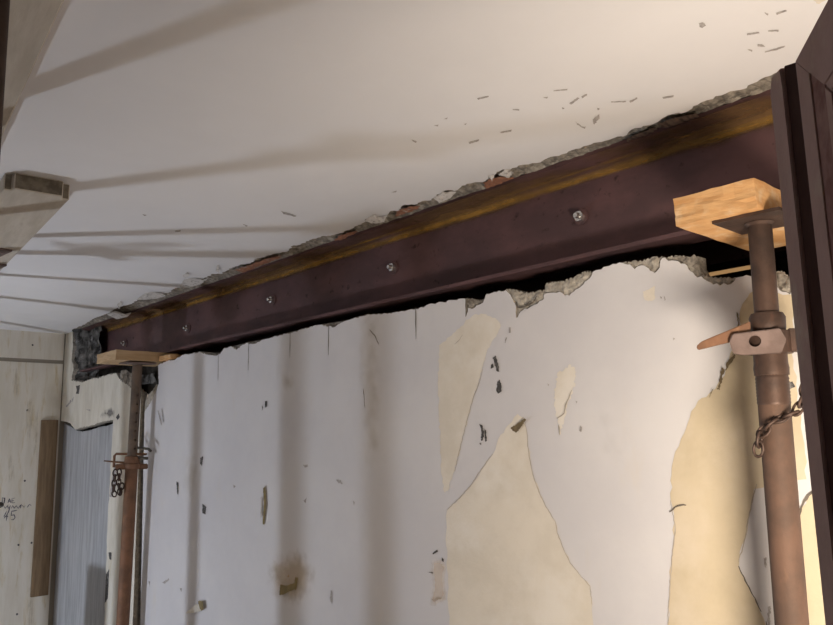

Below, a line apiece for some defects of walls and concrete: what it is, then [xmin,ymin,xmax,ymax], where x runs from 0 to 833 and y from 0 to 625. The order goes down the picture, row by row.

spalling [66,73,776,410]
peeling [776,271,794,330]
peeling [431,414,593,625]
peeling [668,351,771,625]
peeling [788,354,807,480]